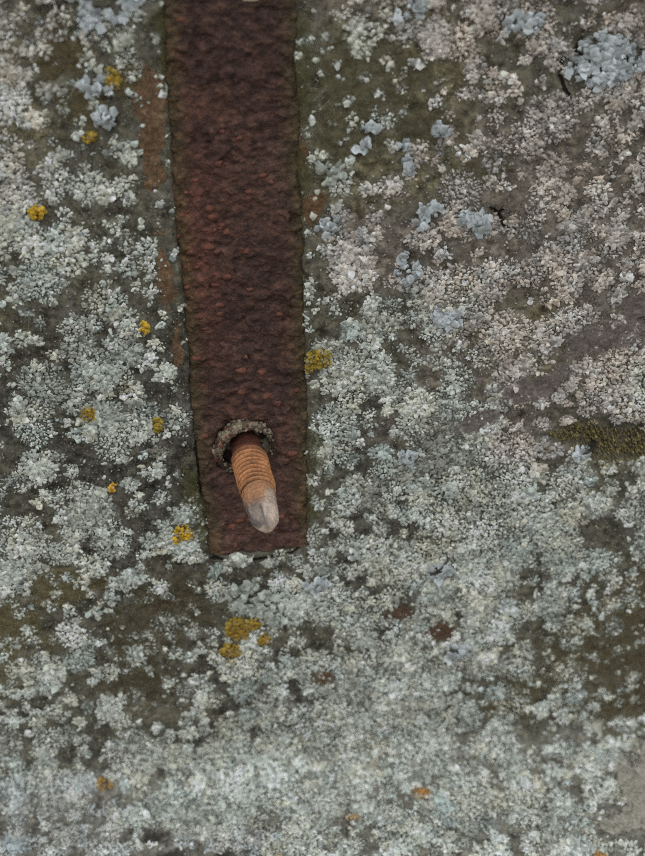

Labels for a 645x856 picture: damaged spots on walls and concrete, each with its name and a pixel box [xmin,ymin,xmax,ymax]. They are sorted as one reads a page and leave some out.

rust [302,192,326,227]